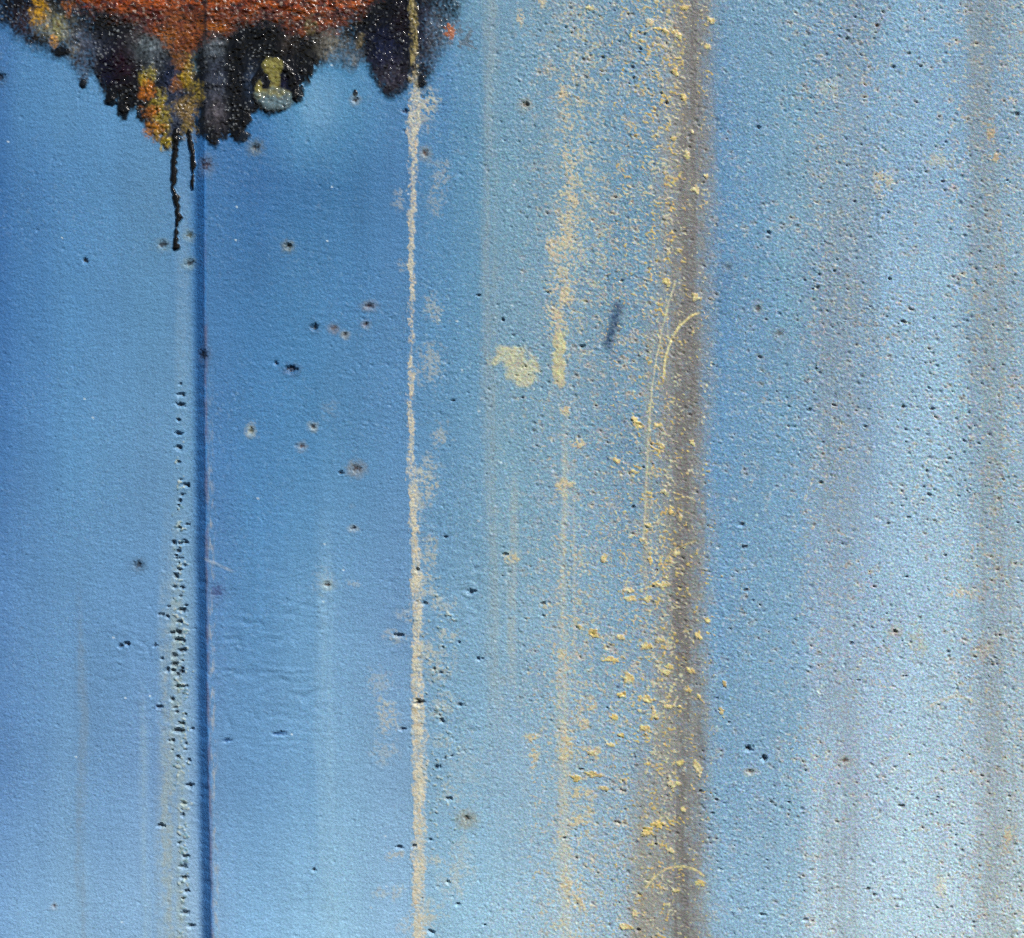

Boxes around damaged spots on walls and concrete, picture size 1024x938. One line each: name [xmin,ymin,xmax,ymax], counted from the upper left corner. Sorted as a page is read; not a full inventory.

rust [0,0,481,252]